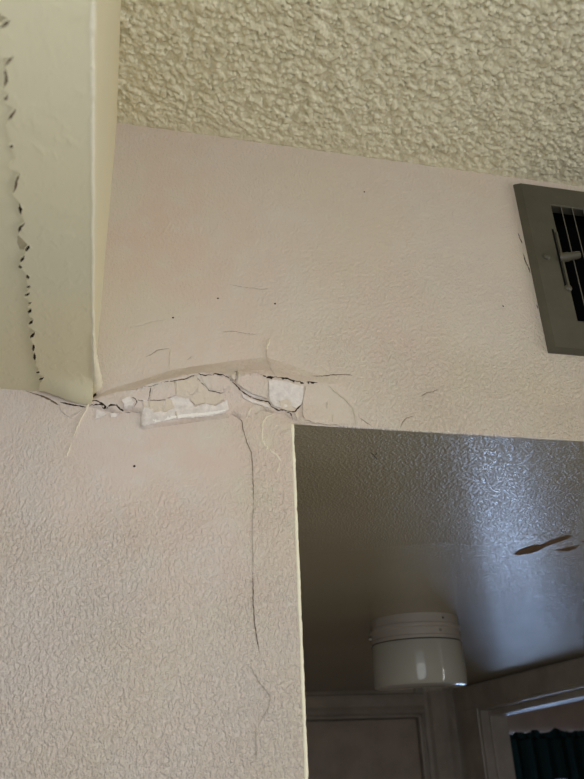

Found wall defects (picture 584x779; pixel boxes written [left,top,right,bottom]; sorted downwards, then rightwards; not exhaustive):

peeling [92,332,103,398]
crack [0,0,302,760]
crack [260,373,353,385]
flaking render [95,369,356,473]
peeling [514,535,584,555]